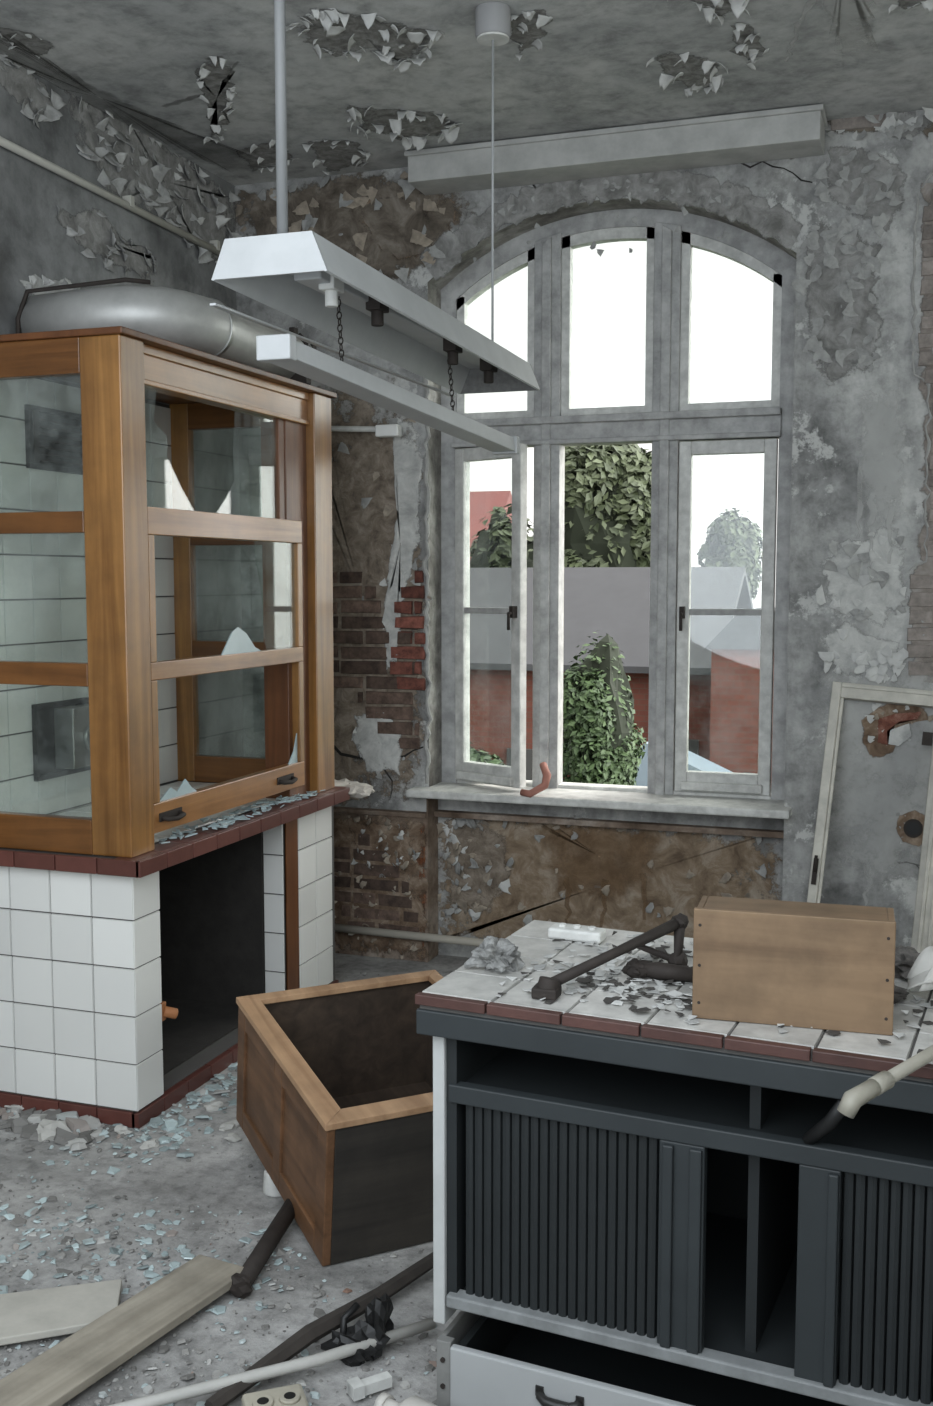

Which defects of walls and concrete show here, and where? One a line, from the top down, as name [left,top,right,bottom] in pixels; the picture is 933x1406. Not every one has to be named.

peeling [286,8,445,74]
peeling [646,0,770,98]
spalling [0,27,933,386]
peeling [816,527,925,684]
flaking render [318,386,782,1025]
spalling [861,703,933,757]
peeling [877,979,933,1044]